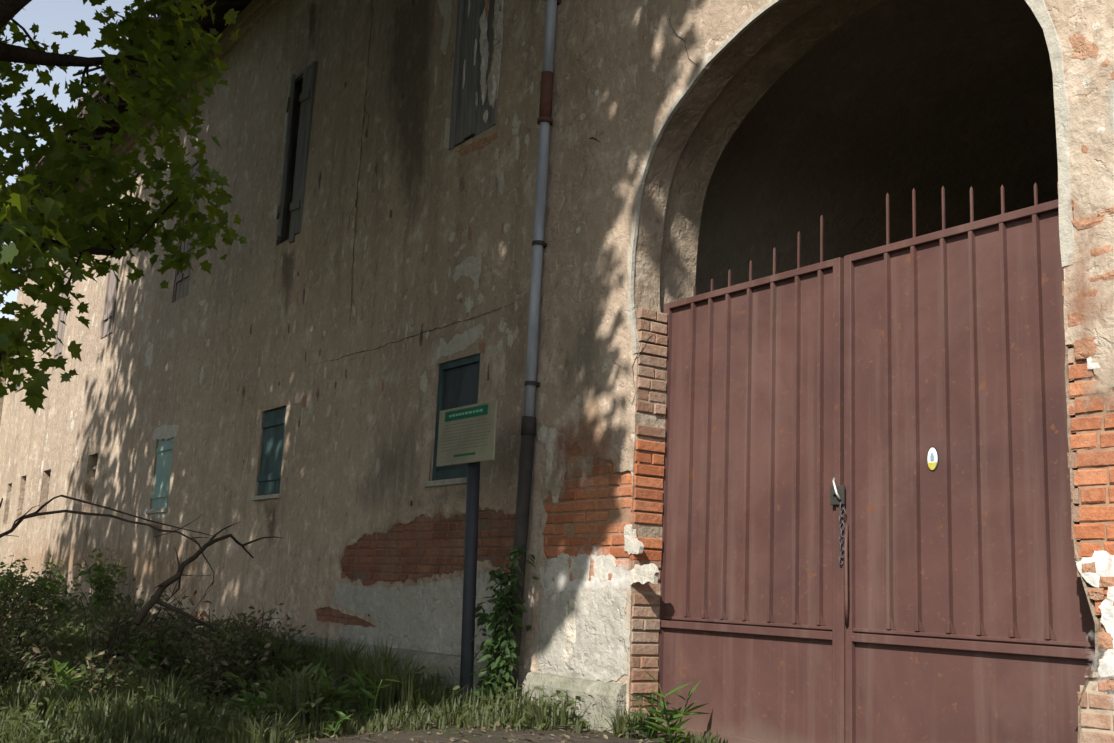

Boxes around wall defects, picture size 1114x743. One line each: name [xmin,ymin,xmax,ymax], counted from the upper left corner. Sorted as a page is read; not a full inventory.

crack [348,6,372,326]
crack [307,301,517,366]
flaking render [1067,344,1114,577]
flaking render [341,506,515,586]
flaking render [543,308,668,722]
flaking render [315,607,376,627]
flaking render [1093,586,1113,659]